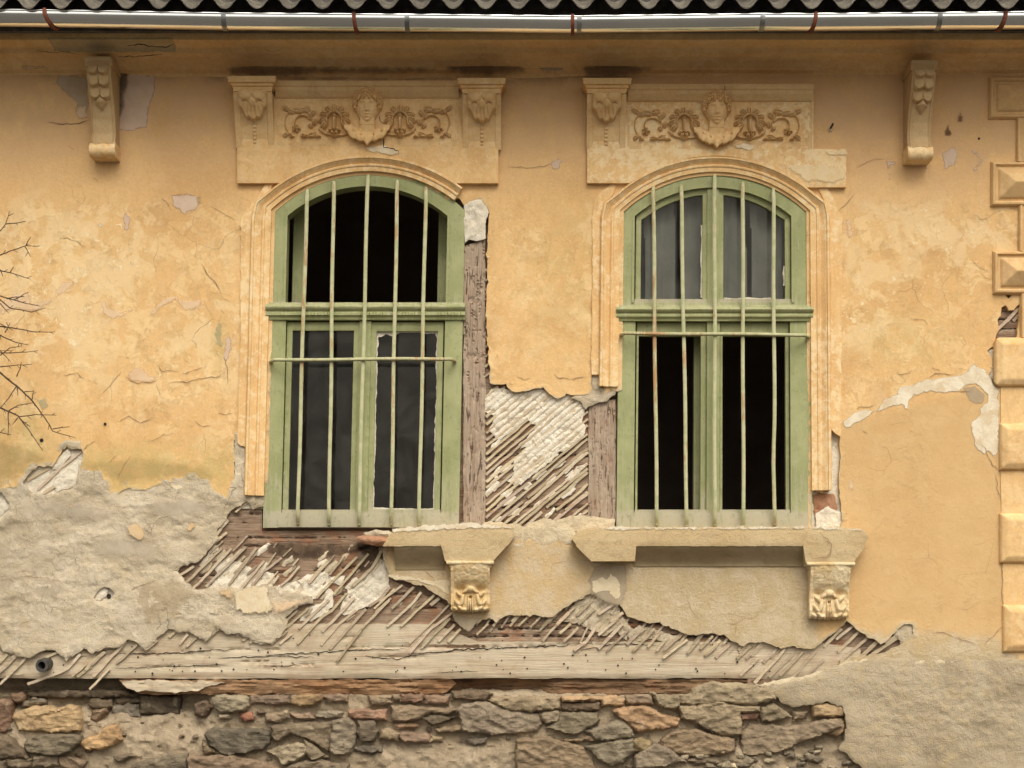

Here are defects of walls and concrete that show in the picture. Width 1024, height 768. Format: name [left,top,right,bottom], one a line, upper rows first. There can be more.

peeling [57,76,88,112]
peeling [119,74,155,130]
peeling [172,194,198,214]
spalling [464,198,489,243]
spalling [988,295,1019,385]
crack [109,357,228,393]
spalling [480,335,616,549]
peeling [0,431,913,690]